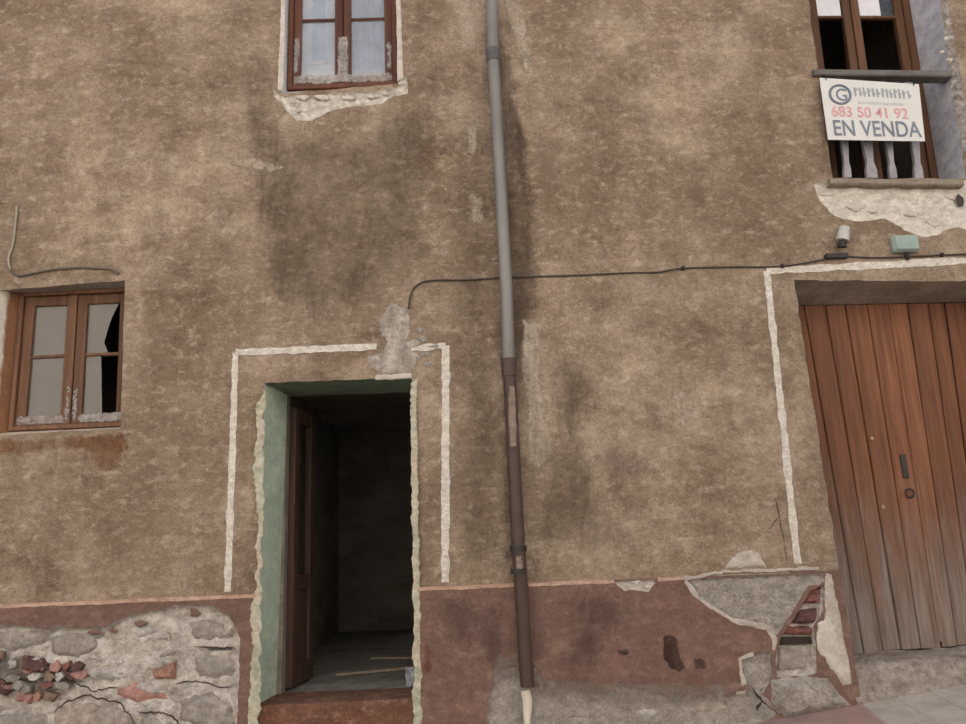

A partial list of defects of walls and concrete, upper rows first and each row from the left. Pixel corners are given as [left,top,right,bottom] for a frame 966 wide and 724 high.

flaking render [273,0,408,121]
flaking render [940,0,966,164]
flaking render [813,179,966,237]
corrosion [0,435,128,469]
peeling [15,386,121,425]
flaking render [0,392,267,724]
peeling [375,373,423,724]
flaking render [486,566,852,724]
water stain [663,636,683,669]